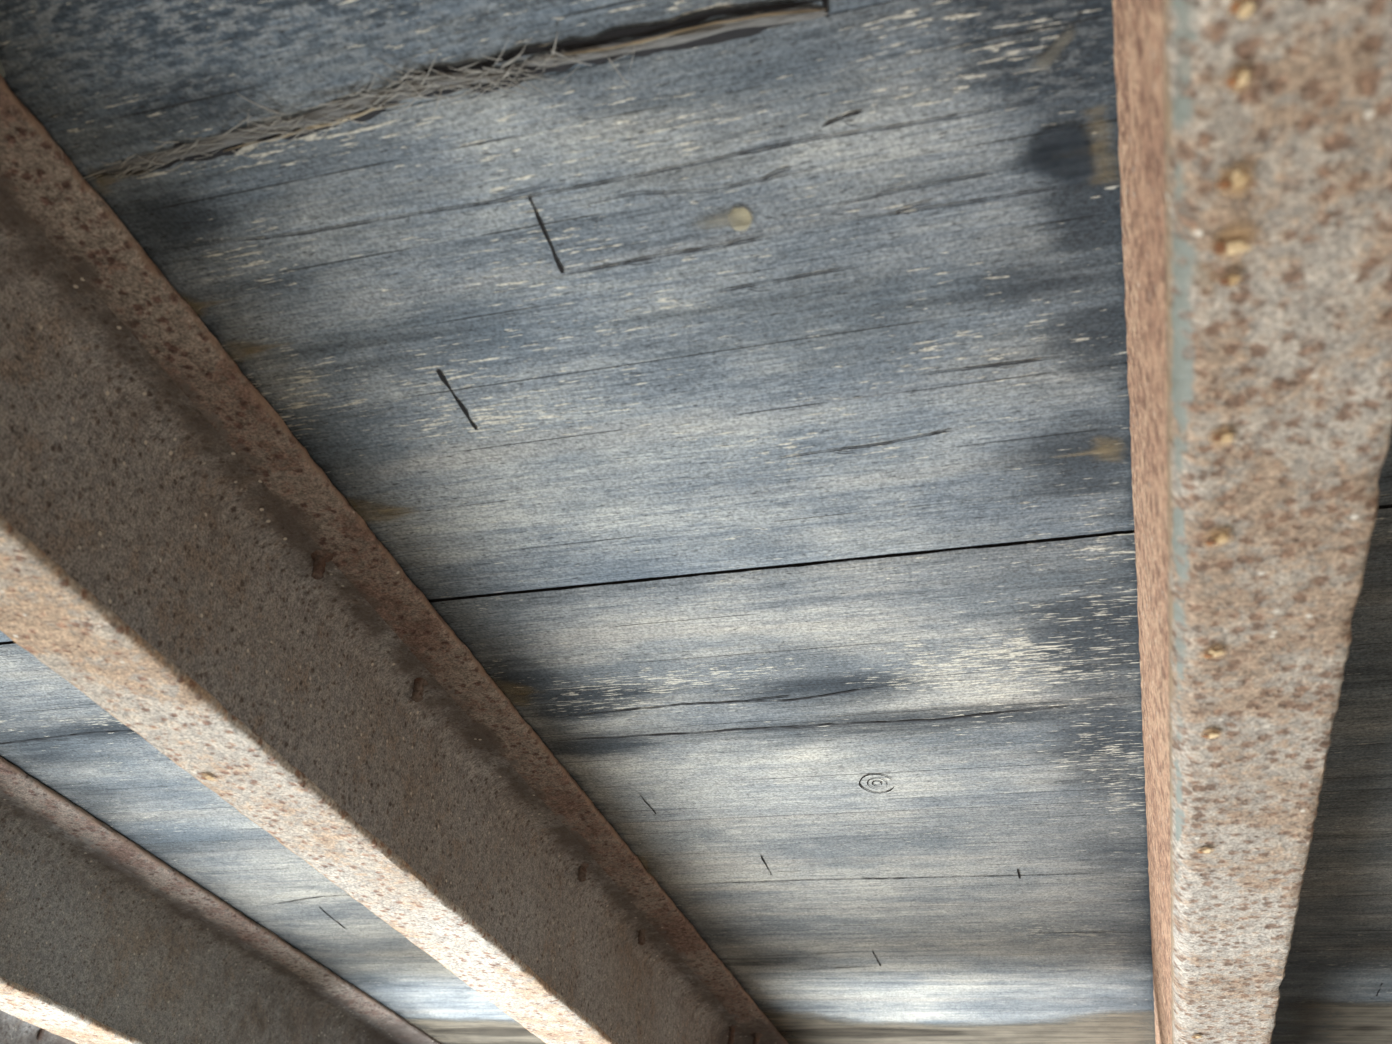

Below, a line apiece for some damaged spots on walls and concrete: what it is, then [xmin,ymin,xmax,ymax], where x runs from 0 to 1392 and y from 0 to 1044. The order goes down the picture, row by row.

corrosion [1229,0,1255,19]
crack [83,0,830,181]
corrosion [1226,68,1250,91]
crack [170,91,1099,249]
water stain [1022,128,1090,183]
corrosion [1216,169,1251,195]
corrosion [1213,228,1250,286]
corrosion [1212,429,1234,446]
corrosion [1202,648,1224,659]
water stain [408,1019,546,1044]
water stain [763,1012,1156,1044]
water stain [1303,1003,1392,1044]